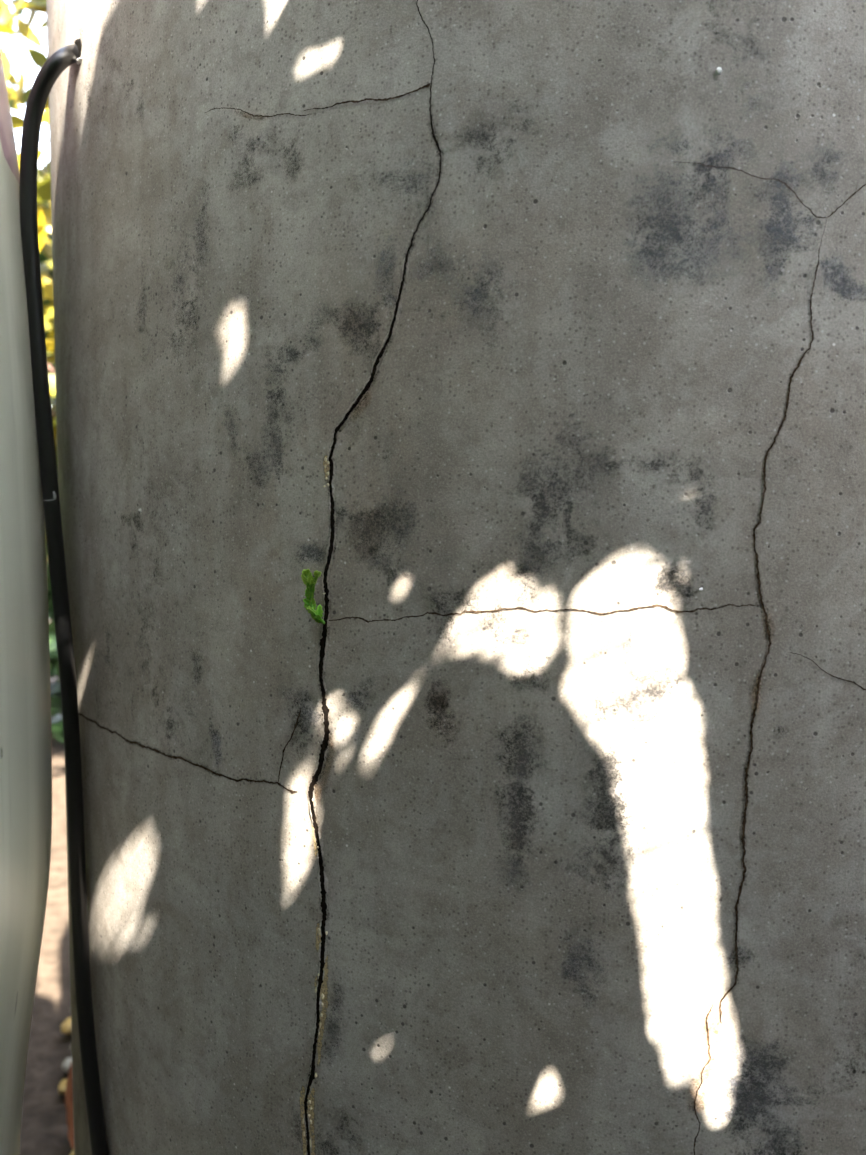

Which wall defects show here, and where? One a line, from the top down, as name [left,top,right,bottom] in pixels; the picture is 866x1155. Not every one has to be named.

crack [205,0,866,1155]
crack [79,709,301,793]
damp [497,725,546,875]
damp [574,750,625,875]